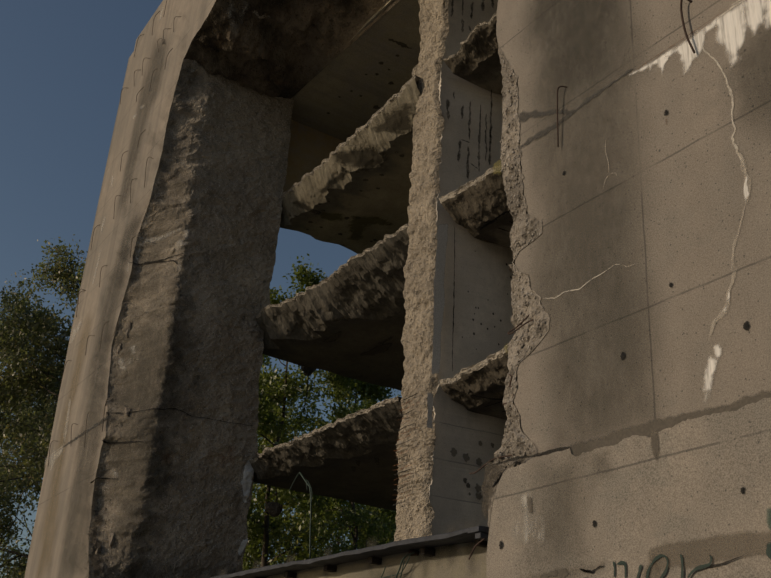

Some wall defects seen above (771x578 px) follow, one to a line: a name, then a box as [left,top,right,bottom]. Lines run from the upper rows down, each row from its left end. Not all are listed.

water stain [633,0,771,73]
crack [702,46,750,199]
peeling [432,224,448,374]
spalling [450,69,550,519]
crack [710,242,736,334]
crack [64,408,252,447]
peeling [241,459,254,503]
spalling [85,499,115,578]